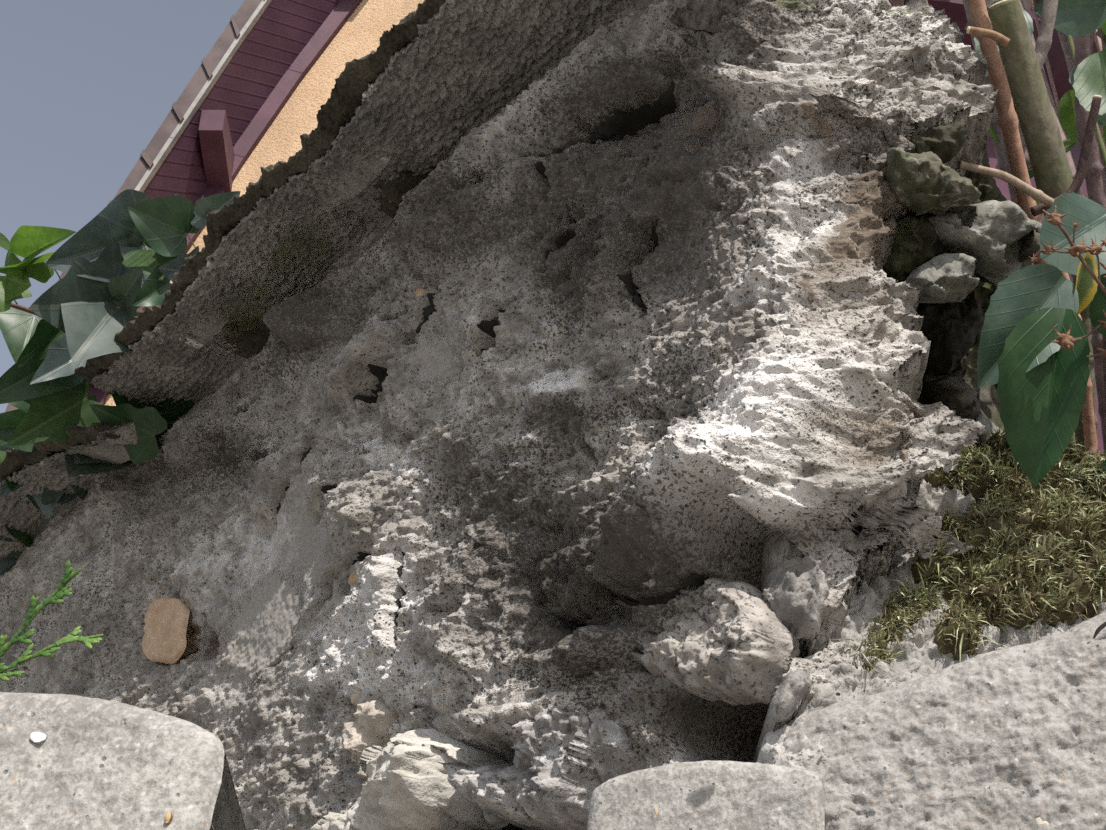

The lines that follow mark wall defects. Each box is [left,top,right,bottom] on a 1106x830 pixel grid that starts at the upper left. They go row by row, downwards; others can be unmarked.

spalling [830,167,902,261]
spalling [834,416,912,473]
crack [352,551,372,565]
flaking render [142,597,220,664]
crack [393,551,407,660]